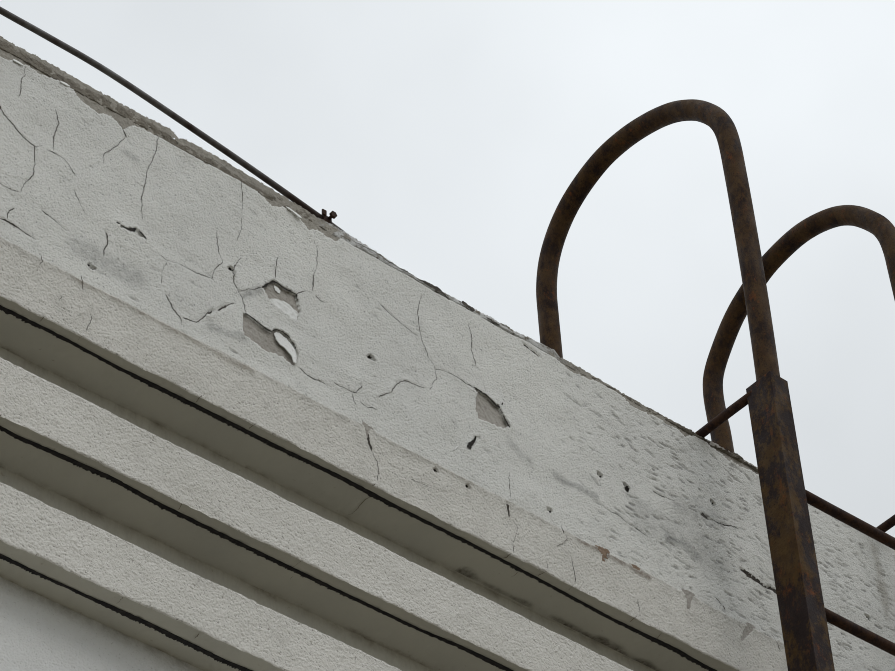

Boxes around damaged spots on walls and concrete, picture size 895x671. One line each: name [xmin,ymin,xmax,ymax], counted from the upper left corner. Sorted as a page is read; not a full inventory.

crack [0,106,82,236]
crack [158,180,278,323]
peeling [262,280,299,320]
peeling [243,313,297,365]
peeling [474,387,510,428]